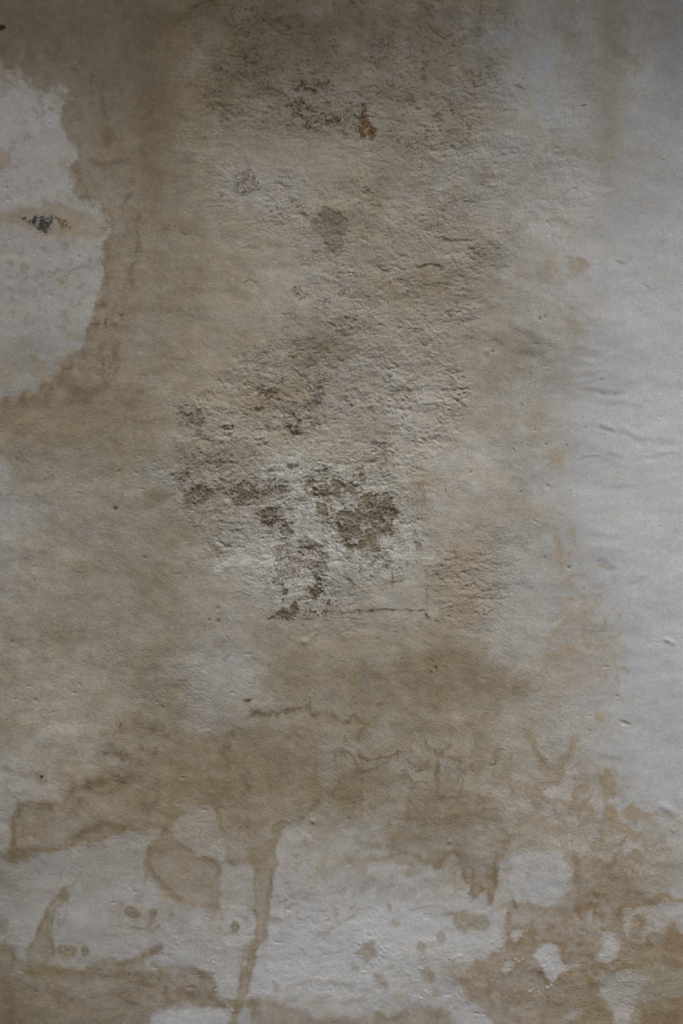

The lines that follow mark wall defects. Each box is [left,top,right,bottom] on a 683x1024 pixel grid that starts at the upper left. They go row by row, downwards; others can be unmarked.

leakage [296,101,406,170]
rust [357,101,380,142]
leakage [207,162,271,205]
leakage [0,0,186,461]
leakage [514,246,593,289]
flaking render [163,330,427,633]
leakage [0,434,683,1024]